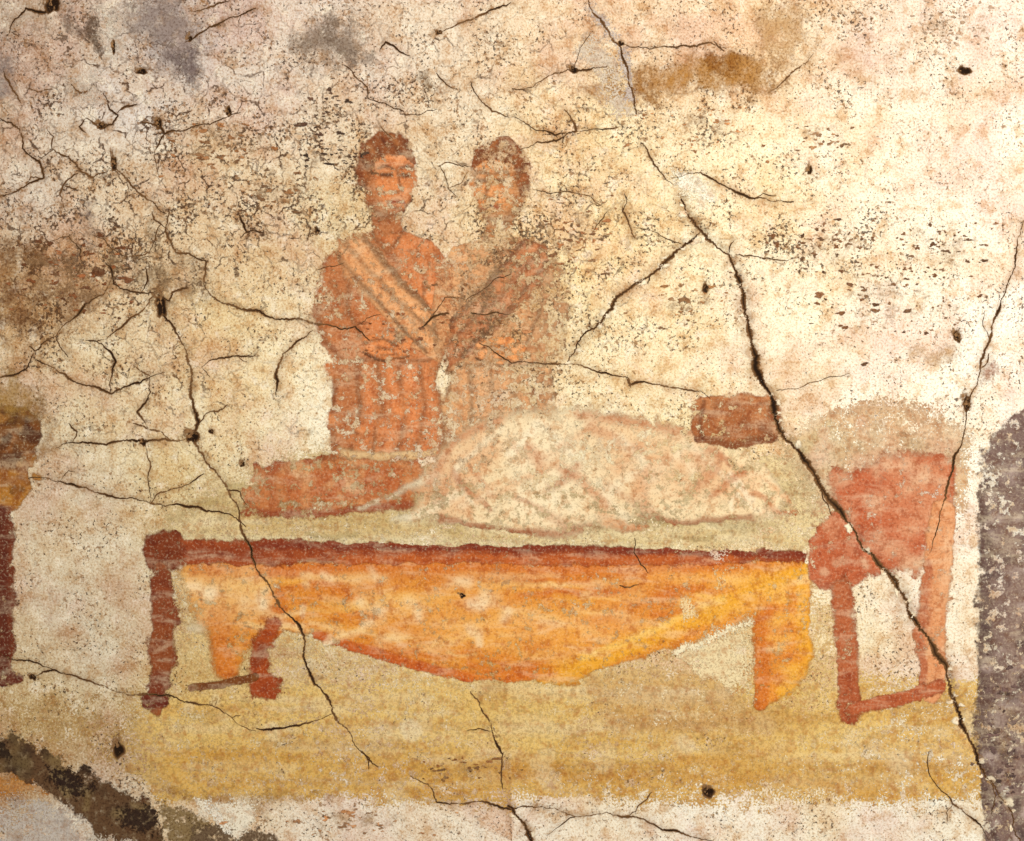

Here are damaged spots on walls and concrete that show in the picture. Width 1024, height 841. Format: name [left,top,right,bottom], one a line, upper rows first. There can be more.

crack [9,7,48,35]
crack [185,1,256,42]
crack [342,64,436,136]
crack [380,41,410,56]
crack [437,0,725,151]
crack [0,71,380,769]
crack [479,142,1024,841]
hole [110,734,126,759]
crack [411,691,712,841]
peeling [982,683,1024,815]
spalling [0,792,137,841]
spalling [192,794,263,841]